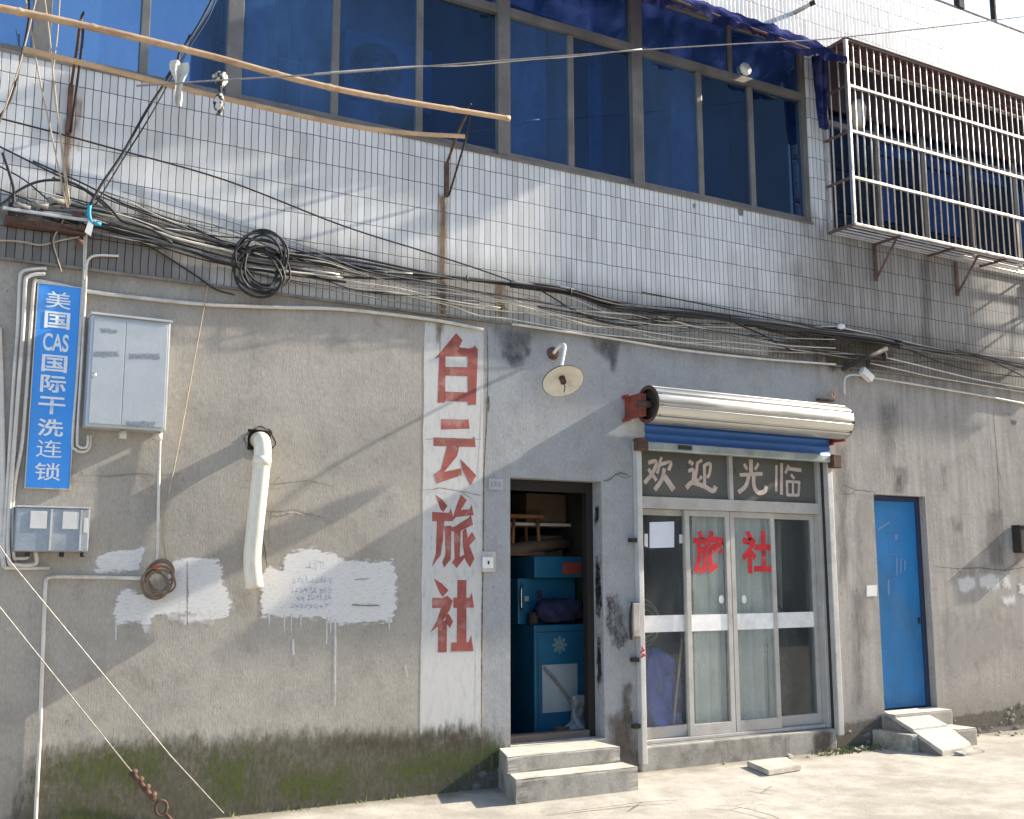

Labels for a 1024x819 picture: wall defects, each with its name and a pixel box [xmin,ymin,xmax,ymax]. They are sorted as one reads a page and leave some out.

corrosion [437,196,445,339]